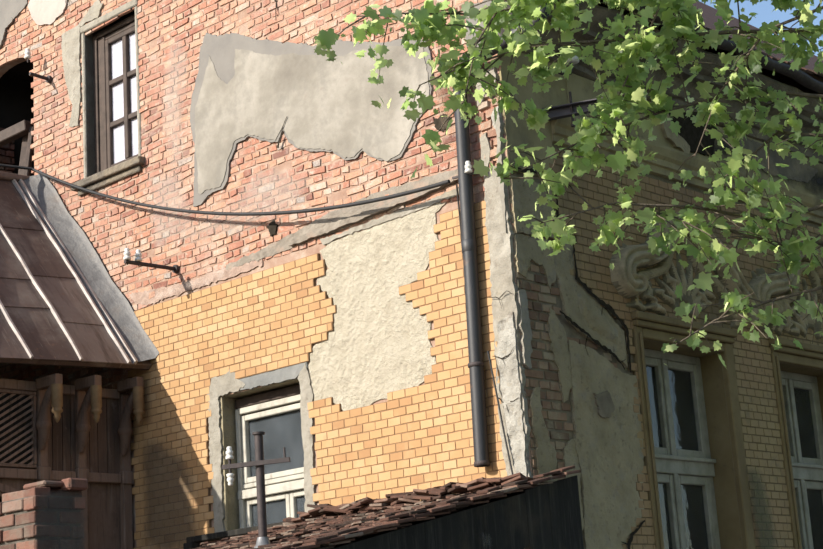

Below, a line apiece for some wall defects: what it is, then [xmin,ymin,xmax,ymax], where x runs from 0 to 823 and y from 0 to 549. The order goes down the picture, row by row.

flaking render [0,0,68,50]
flaking render [465,0,491,47]
flaking render [190,33,434,207]
flaking render [283,67,584,531]
crack [622,520,645,549]